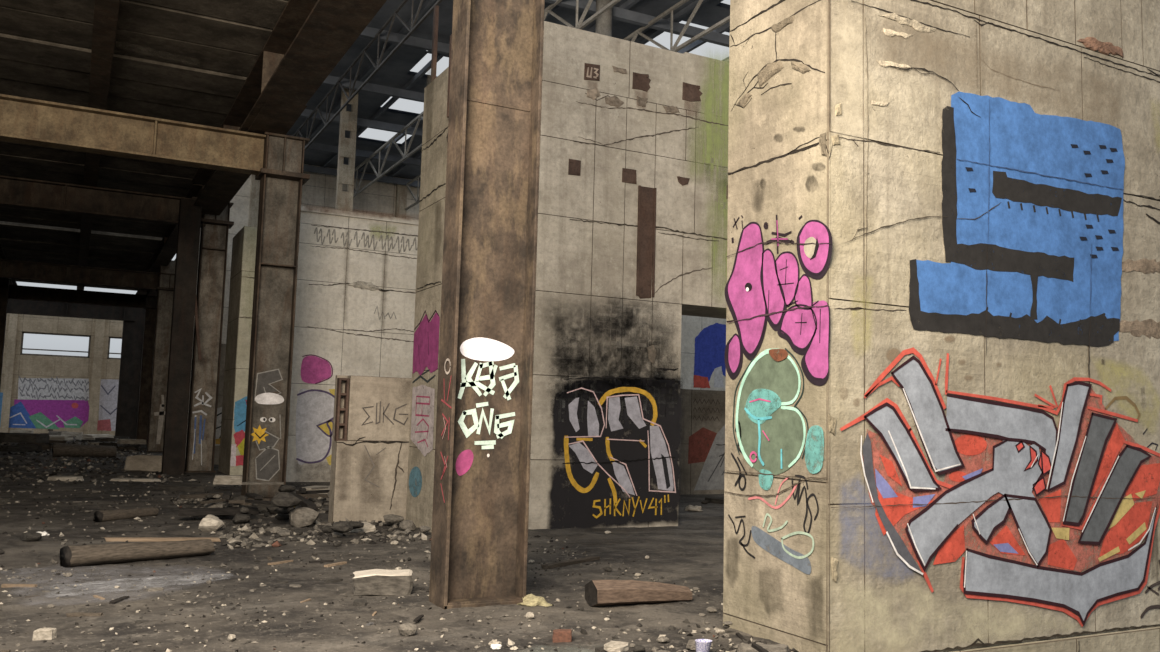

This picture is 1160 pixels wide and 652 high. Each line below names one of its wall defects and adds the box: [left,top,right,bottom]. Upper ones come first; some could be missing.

water stain [697,59,729,283]
crack [565,0,1160,389]